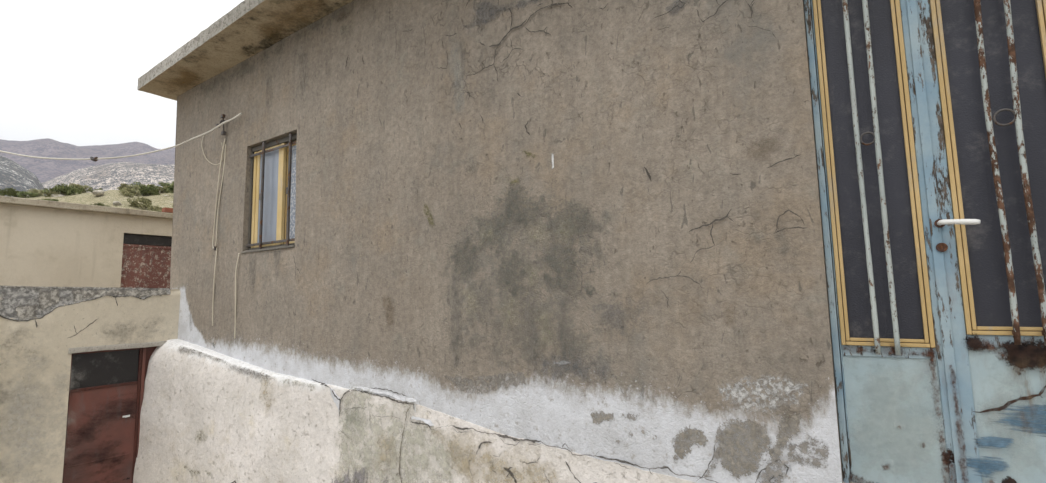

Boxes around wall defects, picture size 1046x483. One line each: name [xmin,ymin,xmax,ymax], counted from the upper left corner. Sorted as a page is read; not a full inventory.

crack [653,0,776,38]
crack [395,0,572,127]
crack [648,210,734,308]
crack [341,396,411,483]
crack [433,425,718,483]
peeling [673,411,829,483]
crack [756,460,789,482]